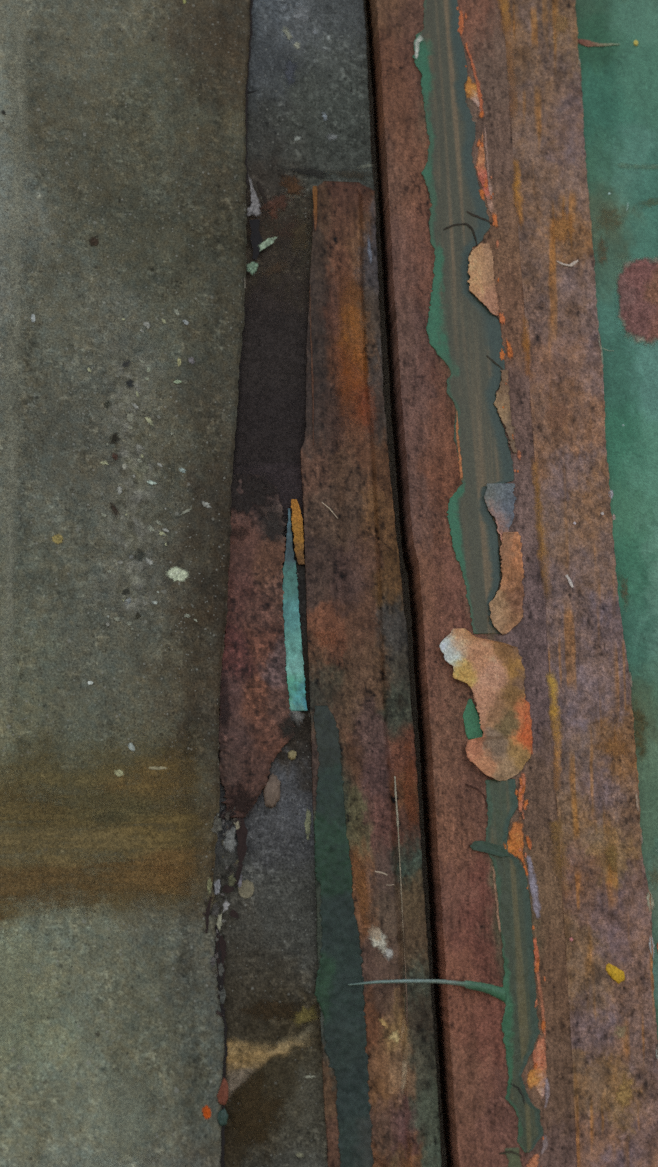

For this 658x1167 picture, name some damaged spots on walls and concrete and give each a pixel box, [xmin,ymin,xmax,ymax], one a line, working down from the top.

corrosion [264,167,365,246]
corrosion [618,258,658,342]
corrosion [291,499,305,565]
peeling [283,0,549,1167]
corrosion [548,676,561,776]